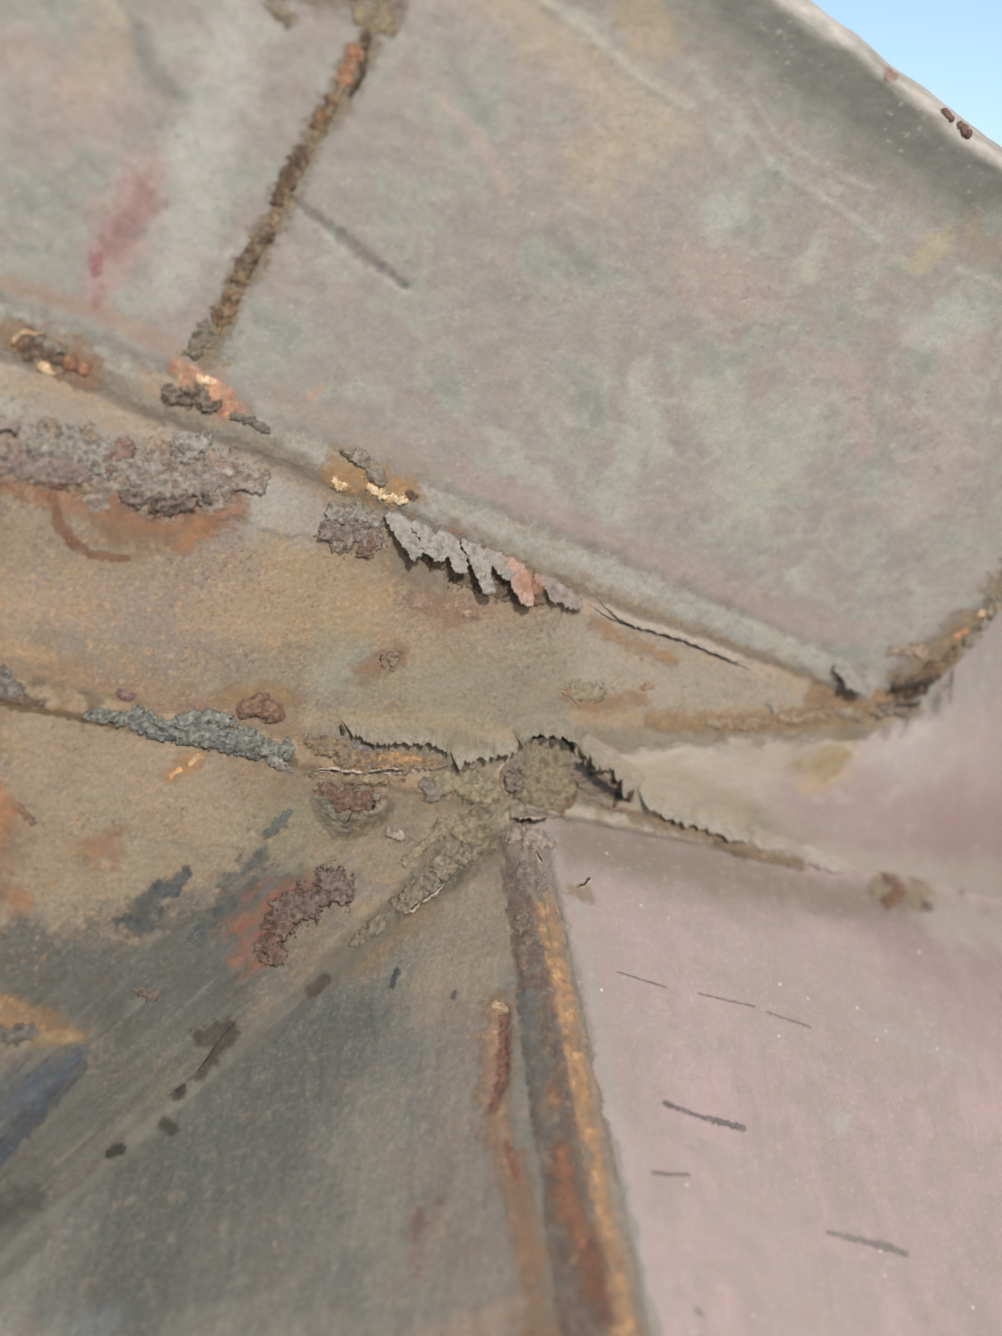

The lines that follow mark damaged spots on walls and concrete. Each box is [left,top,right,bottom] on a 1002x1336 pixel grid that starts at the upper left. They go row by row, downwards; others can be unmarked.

rust [160,0,409,434]
rust [0,320,100,387]
rust [0,408,271,537]
rust [313,447,445,585]
peeling [383,508,583,610]
crack [585,595,754,673]
rust [646,572,1002,736]
rust [0,663,296,784]
peeling [579,733,868,874]
rust [233,860,356,967]
rust [171,1016,239,1100]
rust [348,758,638,1336]